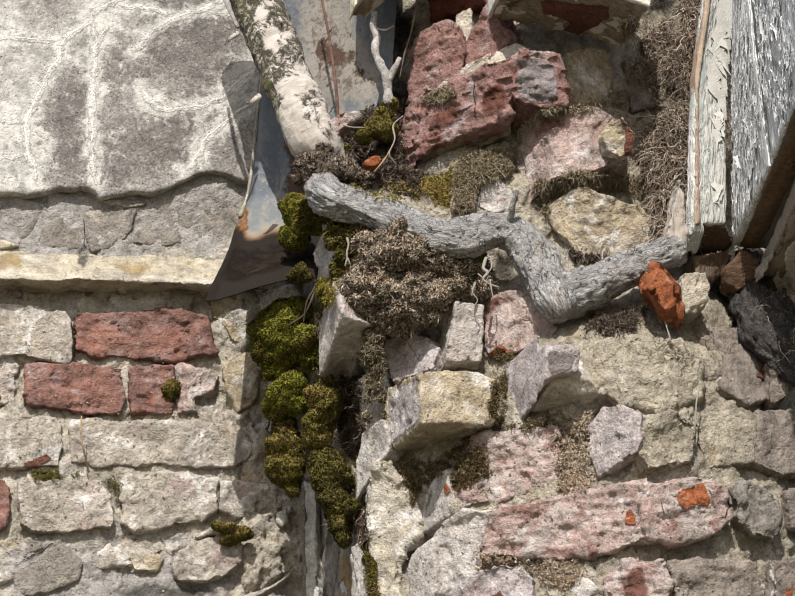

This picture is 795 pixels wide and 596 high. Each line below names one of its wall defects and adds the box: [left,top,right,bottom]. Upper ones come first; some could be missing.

crack [0,0,230,185]
crack [142,68,257,170]
peeling [706,0,795,236]
rust [238,207,248,231]